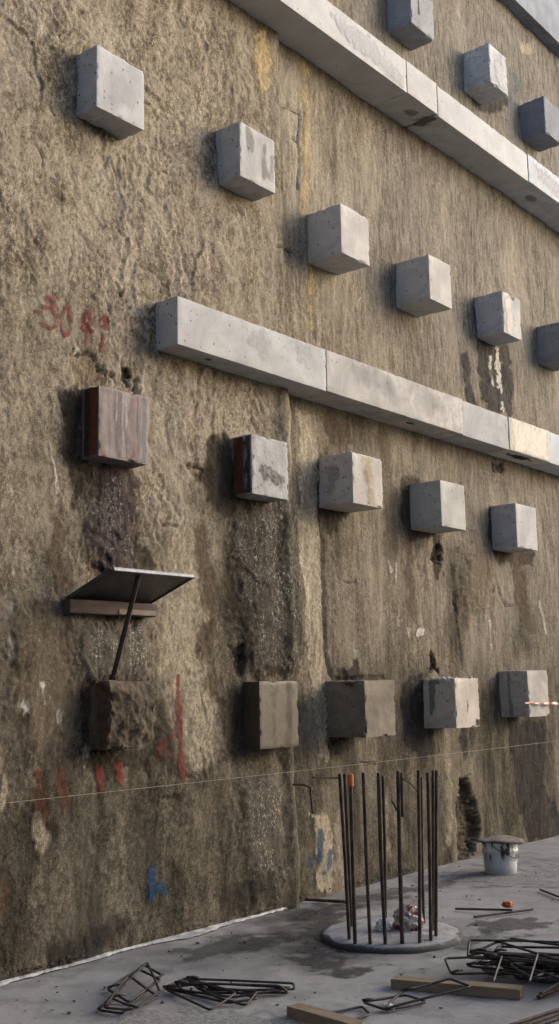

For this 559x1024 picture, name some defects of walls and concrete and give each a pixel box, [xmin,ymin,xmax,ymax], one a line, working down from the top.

rust [88,387,97,456]
rust [233,437,245,495]
leakage [48,384,219,773]
leakage [198,407,363,763]
spalling [455,780,475,856]